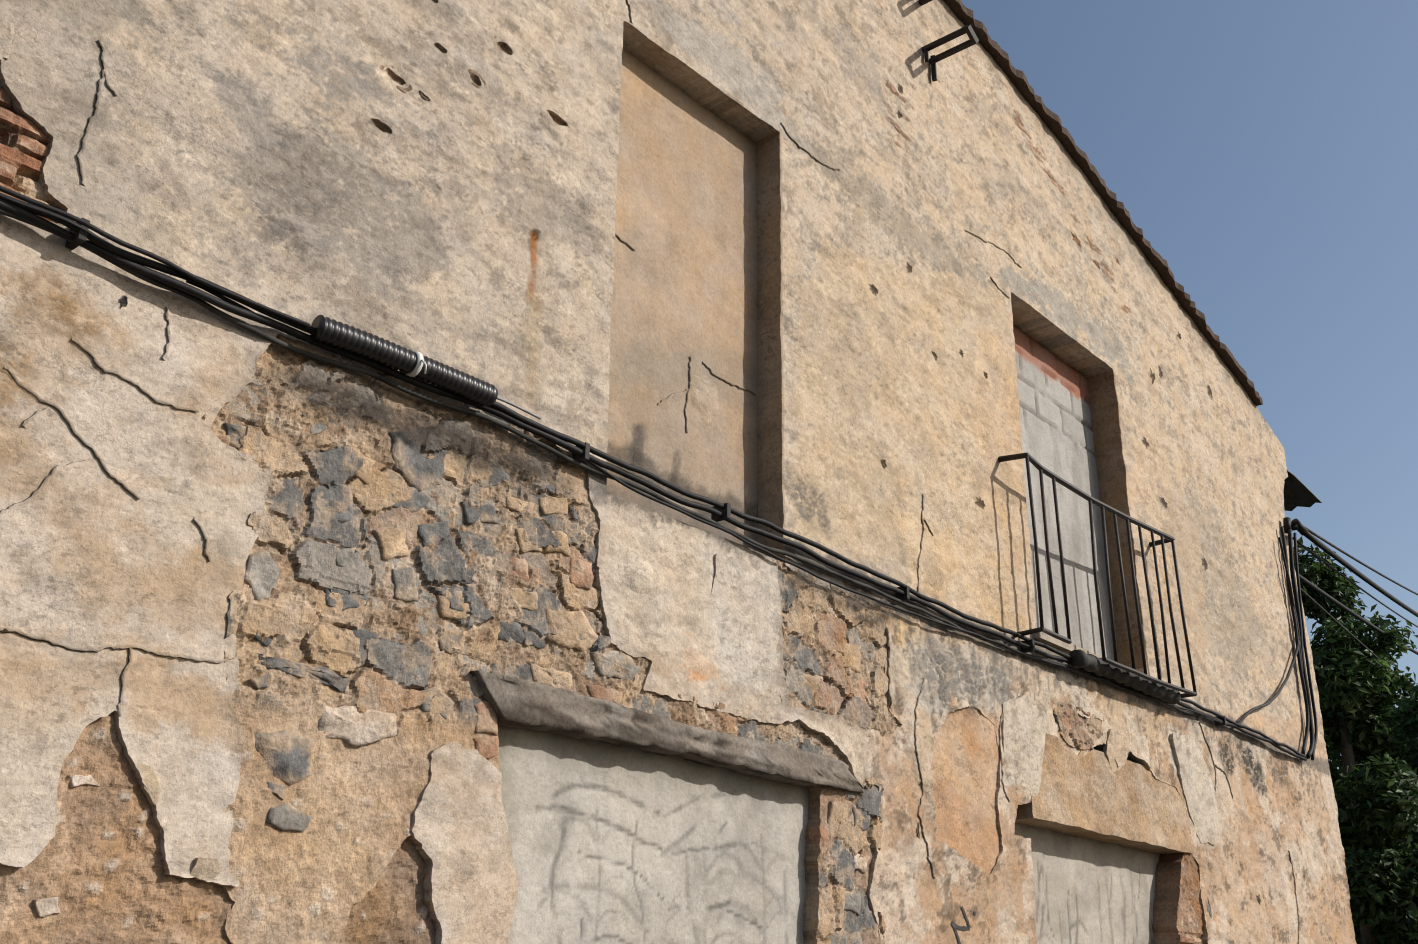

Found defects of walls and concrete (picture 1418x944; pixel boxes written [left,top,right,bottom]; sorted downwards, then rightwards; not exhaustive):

flaking render [0,88,58,224]
crack [76,39,119,186]
crack [781,123,840,170]
rust [531,229,540,265]
crack [965,229,1022,298]
crack [0,366,141,521]
crack [71,307,199,412]
damp [611,425,758,527]
crack [658,356,756,432]
crack [193,517,212,561]
crack [0,625,234,717]
flaking render [0,332,900,944]